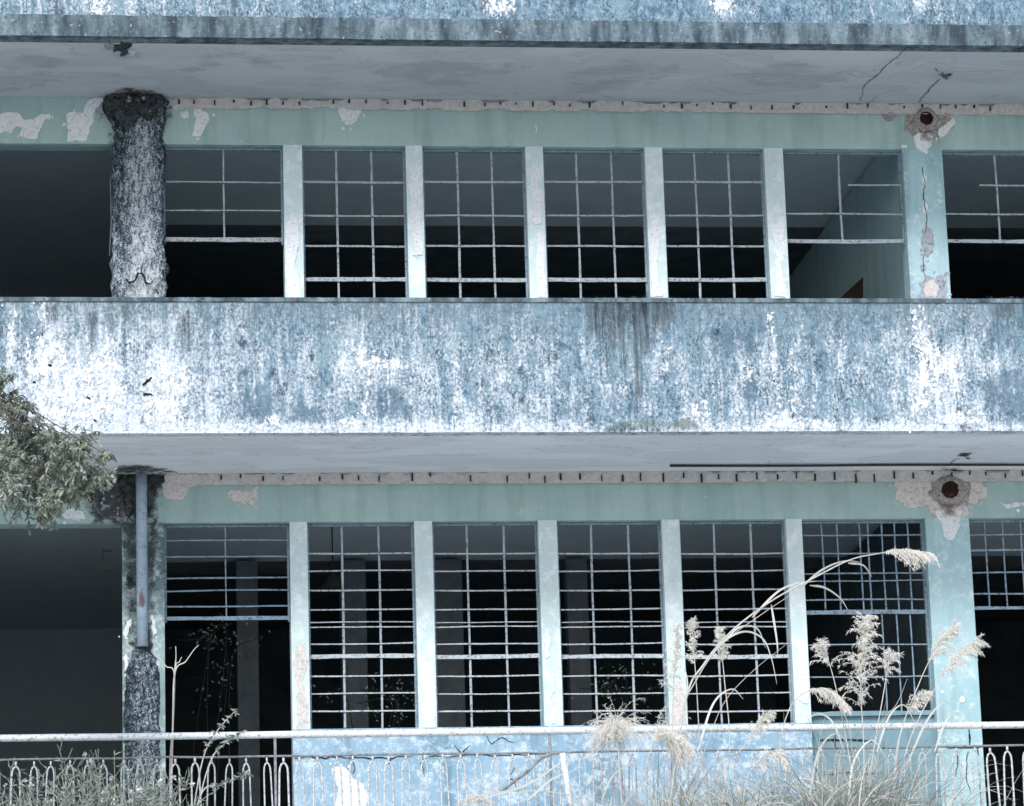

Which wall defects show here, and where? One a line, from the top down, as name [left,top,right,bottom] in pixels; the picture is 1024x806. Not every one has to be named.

spalling [0,88,215,142]
peeling [338,108,365,130]
spalling [883,69,956,154]
crack [920,166,935,277]
damp [588,297,674,404]
peeling [702,271,1024,433]
peeling [669,397,715,432]
spalling [61,465,197,525]
peeling [226,486,259,508]
spalling [889,453,1024,540]